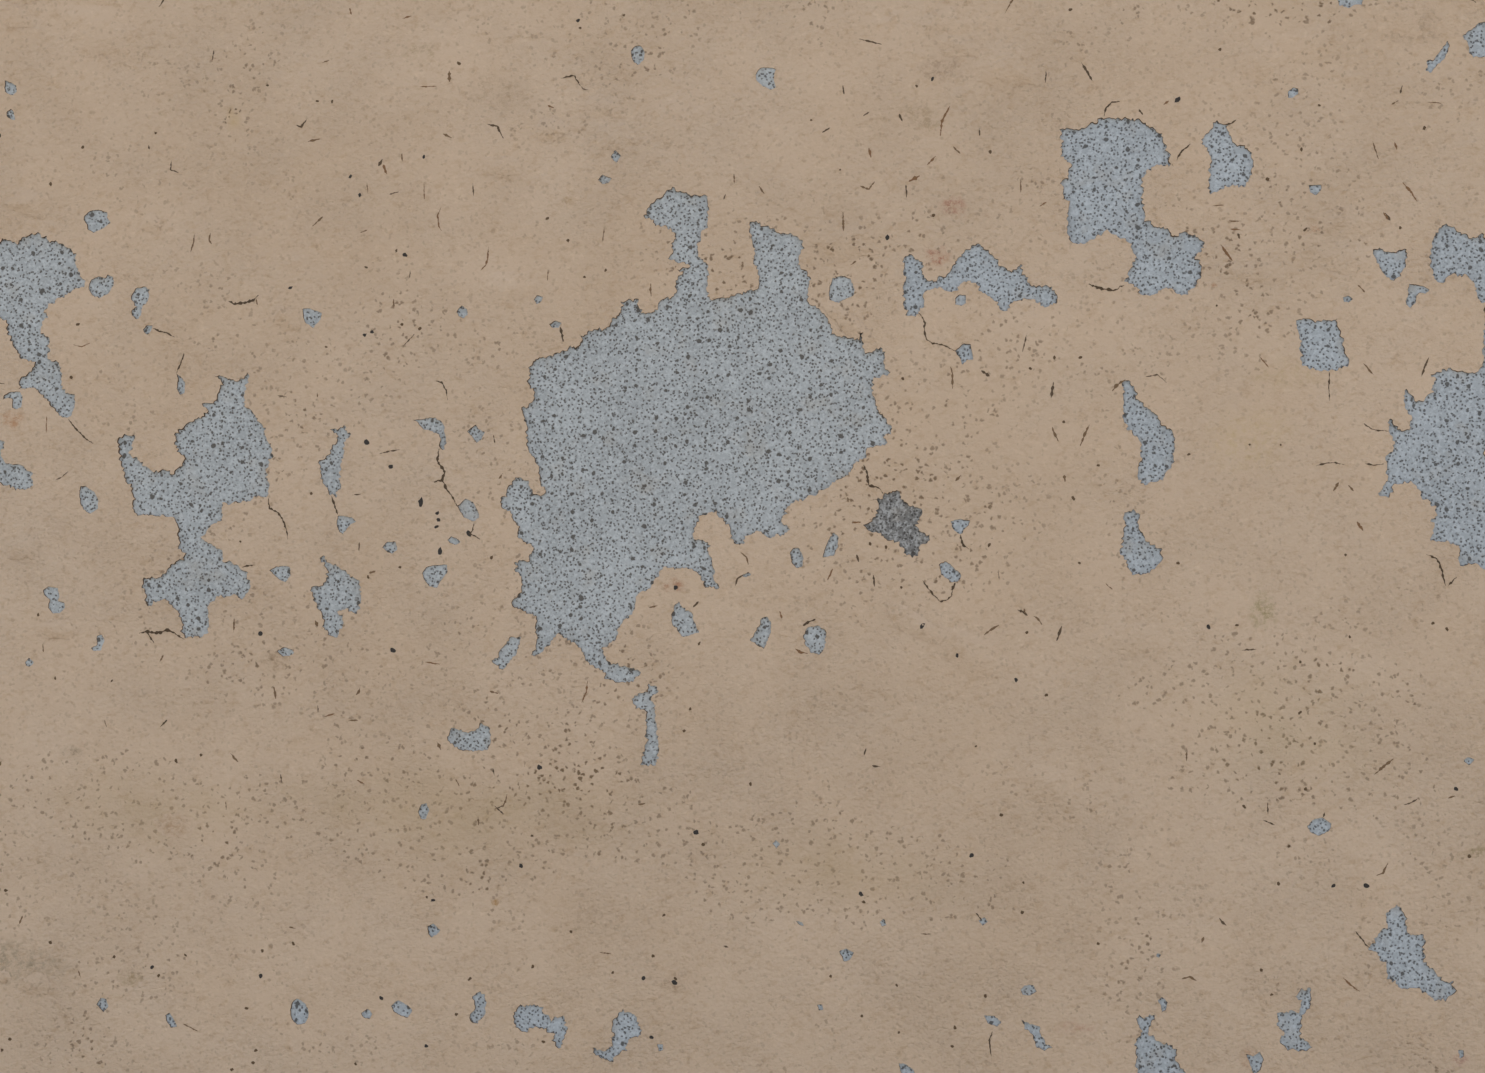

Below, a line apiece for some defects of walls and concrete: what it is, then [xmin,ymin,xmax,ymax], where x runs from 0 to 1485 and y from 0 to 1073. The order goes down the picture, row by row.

peeling [1060,118,1204,296]
peeling [1202,122,1253,194]
peeling [0,233,114,417]
peeling [903,244,1057,317]
peeling [1373,224,1485,307]
peeling [118,374,274,638]
peeling [492,188,892,766]
peeling [864,491,929,558]
peeling [1122,381,1175,485]
peeling [1378,324,1485,569]
peeling [311,556,362,637]
peeling [1368,905,1456,1001]